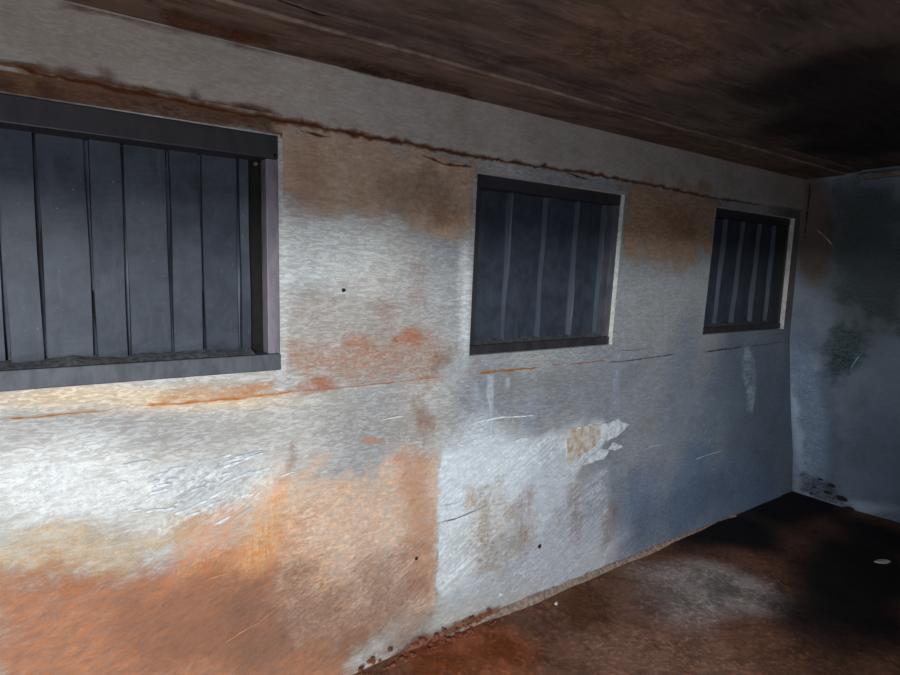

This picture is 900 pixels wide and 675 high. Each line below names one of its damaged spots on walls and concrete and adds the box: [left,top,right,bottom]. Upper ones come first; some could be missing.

crack [0,62,760,205]
corrosion [0,449,439,675]
peeling [436,419,629,603]